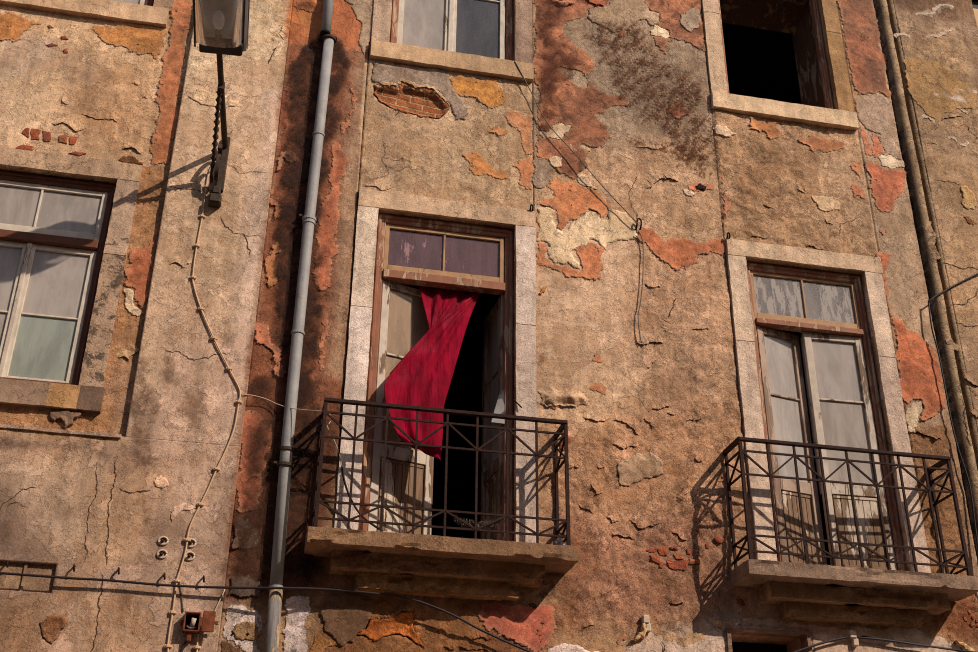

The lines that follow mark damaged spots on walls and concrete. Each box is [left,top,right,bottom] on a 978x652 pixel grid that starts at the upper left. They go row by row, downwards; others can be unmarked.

flaking render [15,118,90,156]
peeling [373,0,732,280]
water stain [585,20,727,222]
peeling [836,0,909,212]
peeling [903,57,978,146]
water stain [274,34,351,582]
peeling [876,251,946,441]
crack [85,457,151,652]
peeling [221,604,263,652]
water stain [236,375,286,578]
peeling [443,600,599,652]
peeling [626,617,975,652]